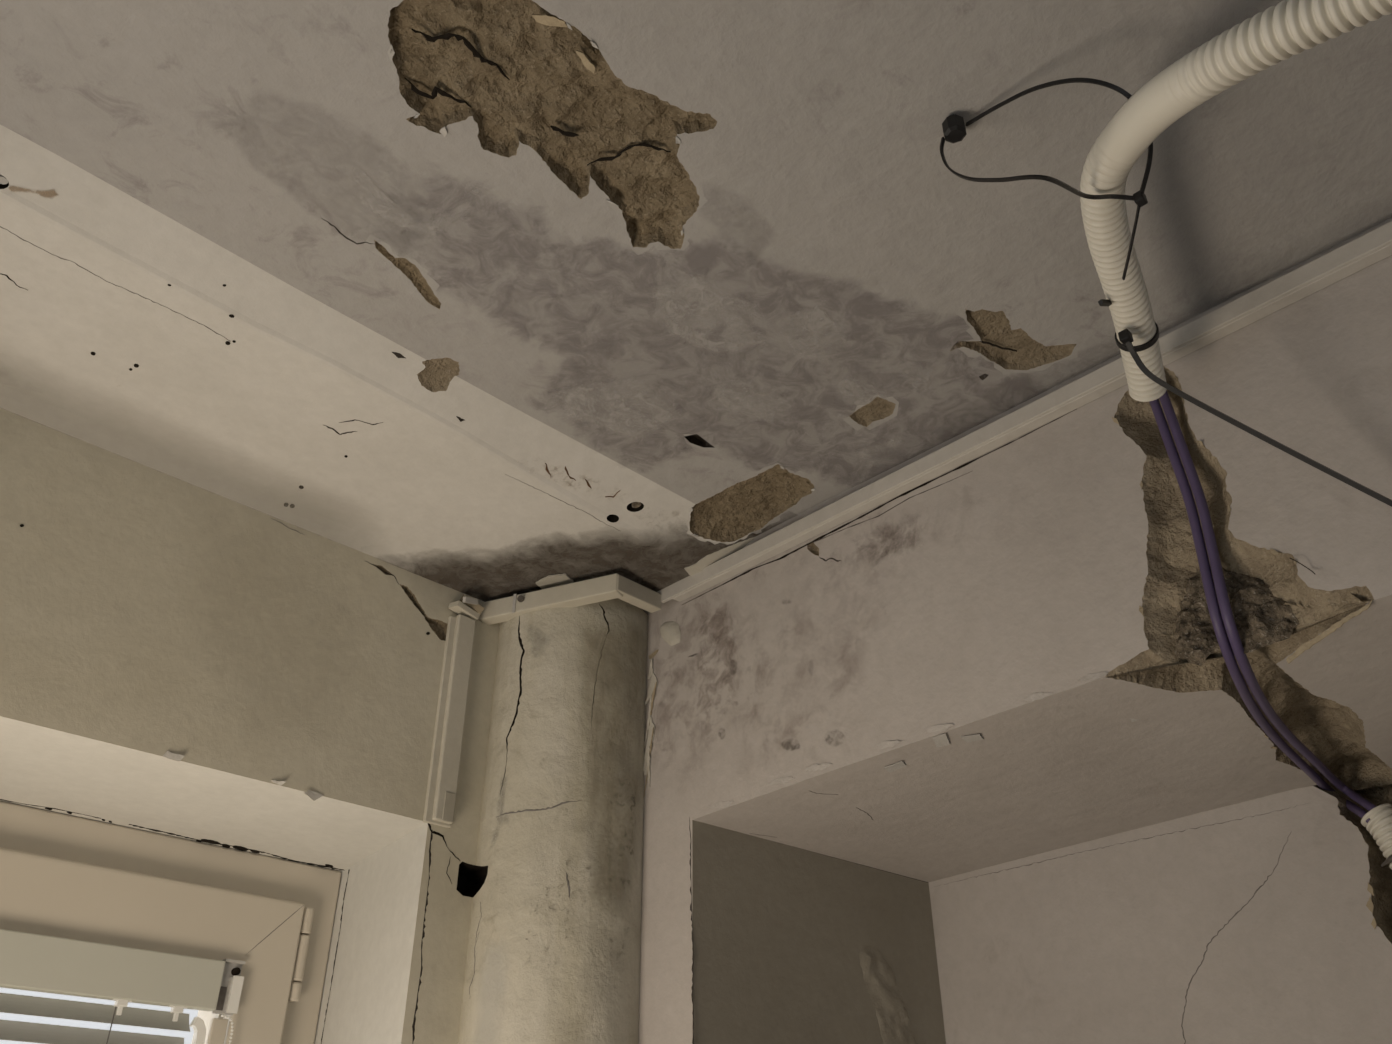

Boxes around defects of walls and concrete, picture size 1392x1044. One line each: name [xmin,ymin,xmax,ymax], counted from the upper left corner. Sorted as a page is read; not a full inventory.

flaking render [388,0,717,249]
flaking render [323,219,441,309]
flaking render [417,358,460,392]
damp [534,246,994,480]
flaking render [950,309,1076,380]
flaking render [689,464,815,542]
flaking render [366,561,448,641]
damp [409,526,772,602]
crack [591,604,610,731]
crack [497,616,583,817]
spalling [456,862,488,897]
crack [934,803,1308,1044]